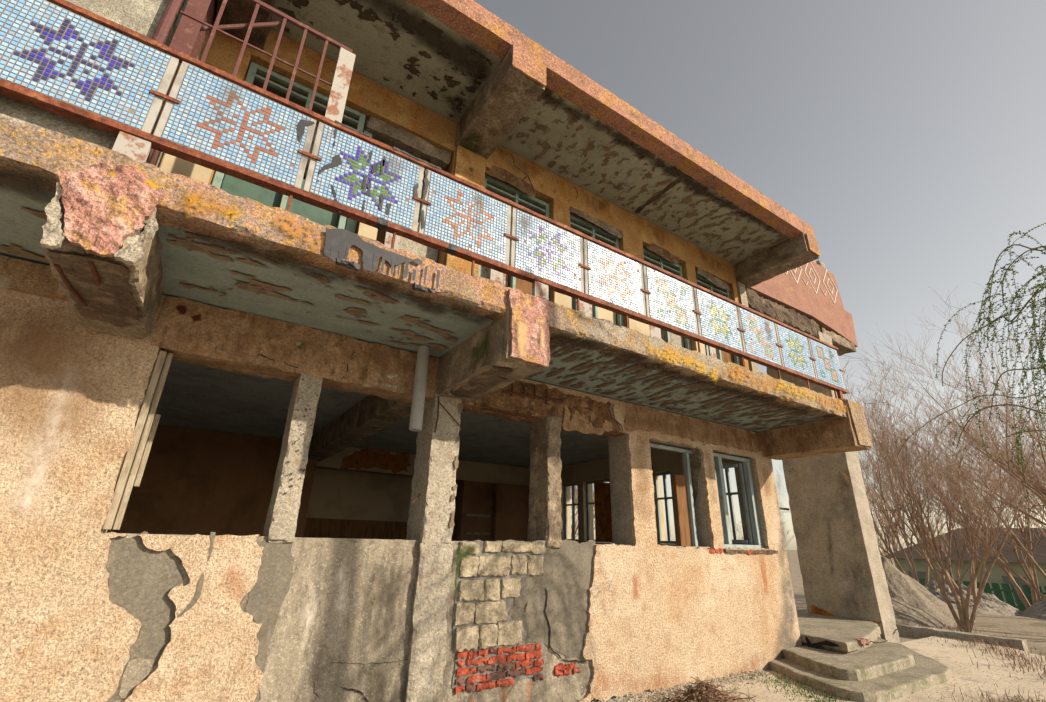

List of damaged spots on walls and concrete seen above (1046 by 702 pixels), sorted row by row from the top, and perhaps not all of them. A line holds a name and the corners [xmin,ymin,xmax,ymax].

peeling [278,0,319,39]
peeling [335,0,484,117]
spalling [0,180,459,353]
peeling [434,334,836,442]
spalling [690,449,700,533]
peeling [106,531,184,702]
peeling [240,536,420,702]
water stain [375,573,401,640]
peeling [441,539,618,702]
crack [524,588,588,664]